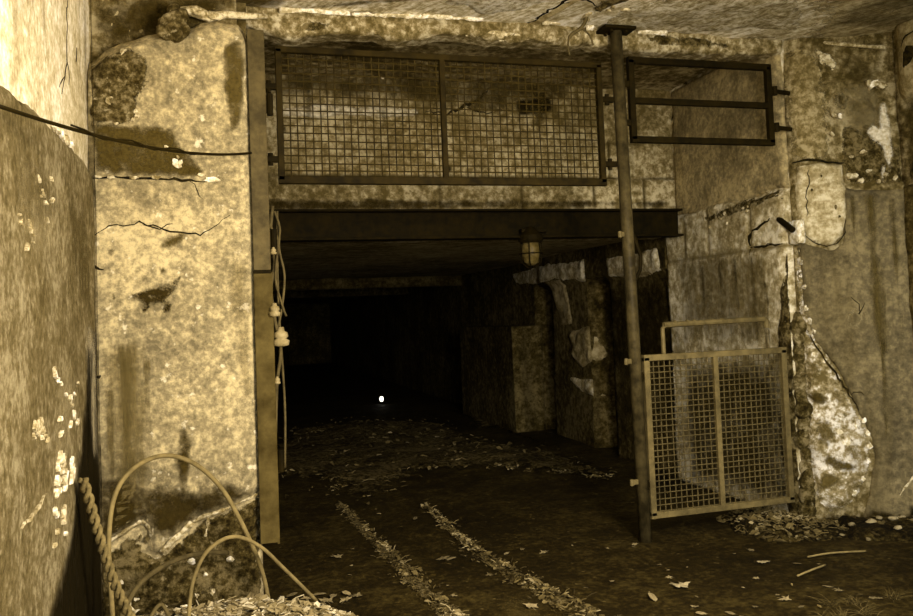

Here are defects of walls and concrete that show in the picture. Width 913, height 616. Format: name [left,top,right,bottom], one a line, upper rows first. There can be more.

spalling [156,3,268,43]
crack [527,0,597,25]
peeling [90,48,221,182]
damp [224,42,244,128]
spalling [828,93,913,184]
spalling [865,80,889,90]
crack [95,215,230,236]
damp [52,216,242,616]
peeling [778,249,873,517]